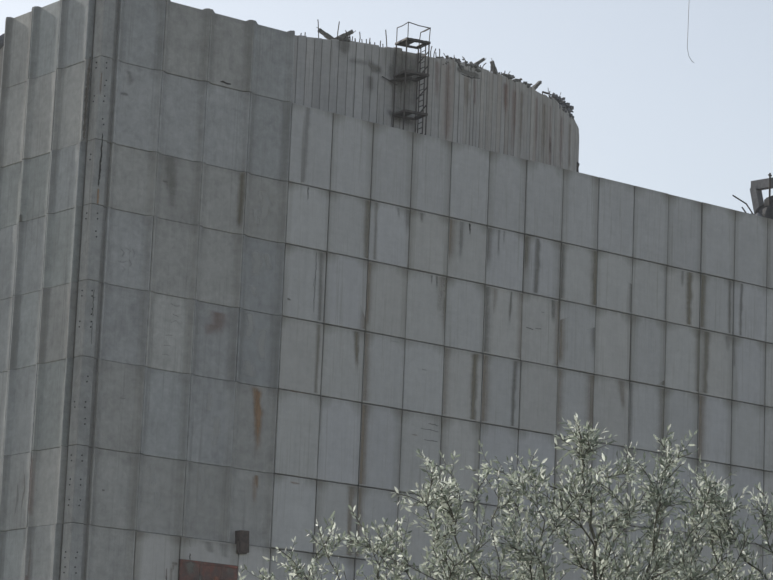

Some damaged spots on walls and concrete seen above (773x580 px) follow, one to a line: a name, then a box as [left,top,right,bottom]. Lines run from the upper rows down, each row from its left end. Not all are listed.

crack [83,57,103,203]
water stain [348,202,370,556]
water stain [471,287,488,420]
water stain [687,272,709,457]